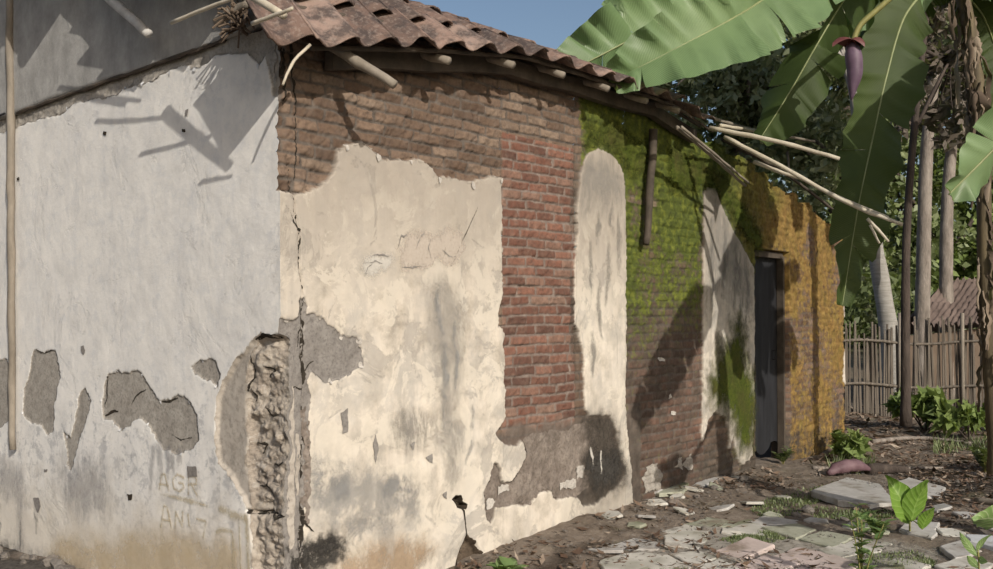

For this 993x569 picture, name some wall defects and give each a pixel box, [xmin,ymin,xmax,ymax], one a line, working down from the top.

peeling [0,358,9,428]
peeling [21,349,199,470]
spalling [187,466,197,477]
spalling [191,298,364,569]
crack [288,169,314,568]
spalling [484,421,596,523]
spalling [443,491,483,566]